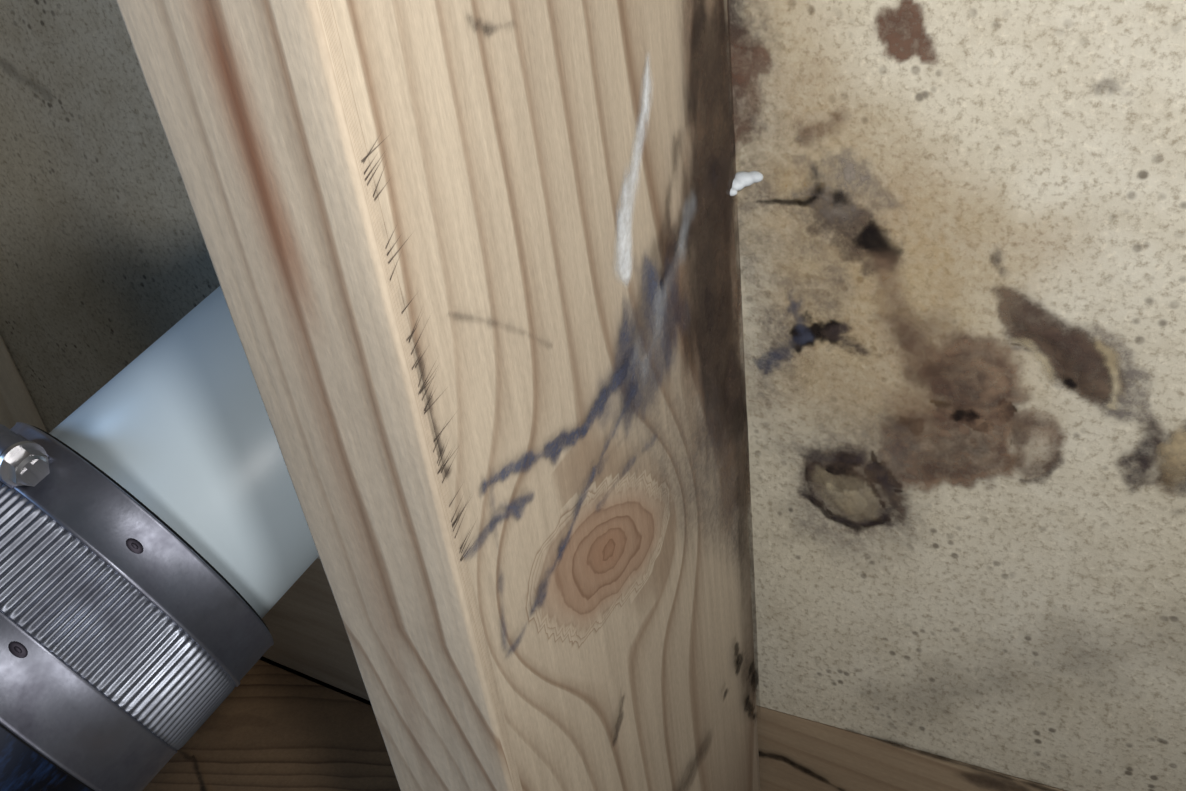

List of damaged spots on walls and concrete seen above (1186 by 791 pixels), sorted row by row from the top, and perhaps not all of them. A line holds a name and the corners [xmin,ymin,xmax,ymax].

water stain [876,0,935,62]
water stain [783,154,899,296]
water stain [474,0,769,632]
water stain [758,303,867,371]
water stain [880,323,1062,490]
water stain [1120,421,1186,489]